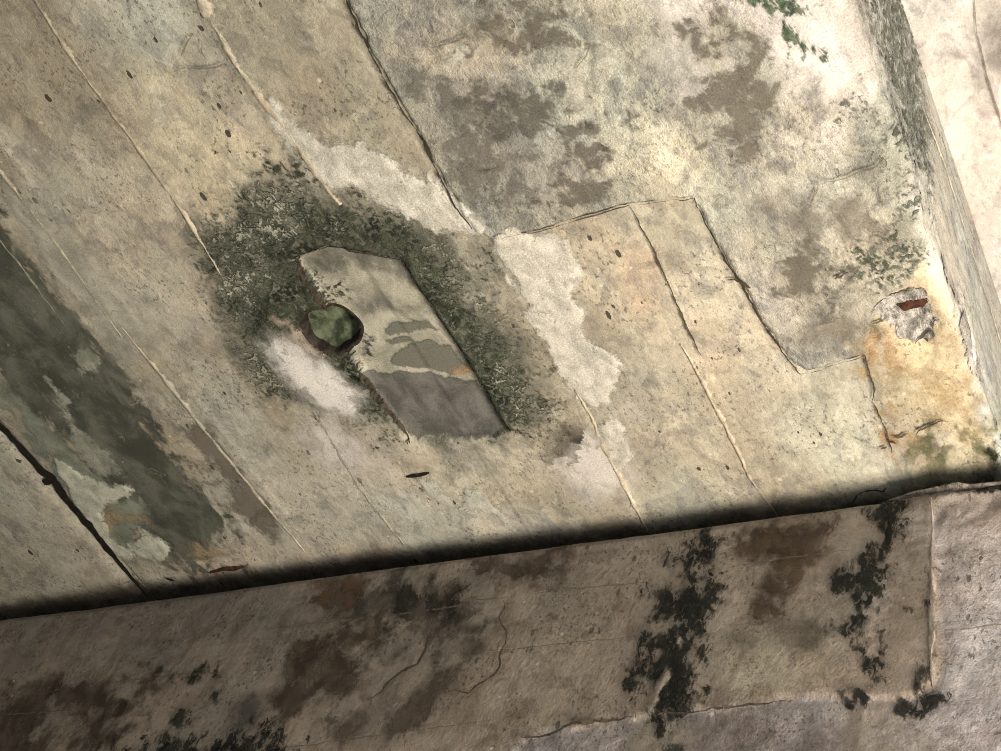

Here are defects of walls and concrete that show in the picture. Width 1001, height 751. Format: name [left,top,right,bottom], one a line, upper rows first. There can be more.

crack [346,0,472,229]
damp [266,0,621,235]
damp [663,0,721,61]
damp [682,0,875,166]
crack [515,198,945,453]
spalling [871,288,941,343]
damp [0,179,952,751]
crack [271,598,634,700]